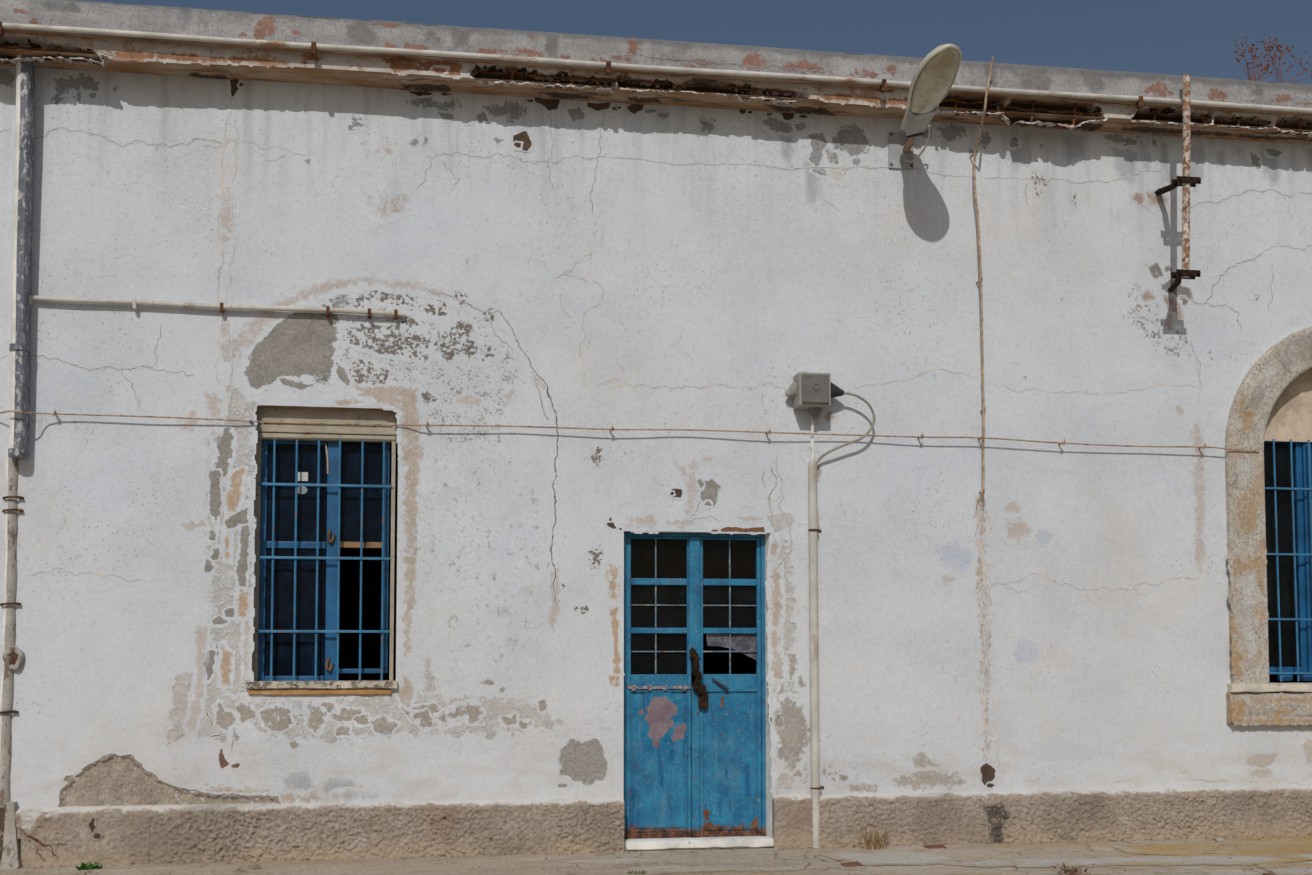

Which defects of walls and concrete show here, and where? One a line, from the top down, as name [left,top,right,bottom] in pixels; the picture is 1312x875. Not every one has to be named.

peeling [402,63,878,187]
crack [0,93,307,407]
crack [416,111,1312,409]
corrosion [1129,187,1174,211]
peeling [1117,274,1218,371]
peeling [1242,326,1312,411]
crack [426,288,561,606]
peeling [15,268,1035,841]
crack [761,456,793,569]
peeling [1233,569,1263,670]
crack [19,828,93,875]
corrosion [703,795,758,831]